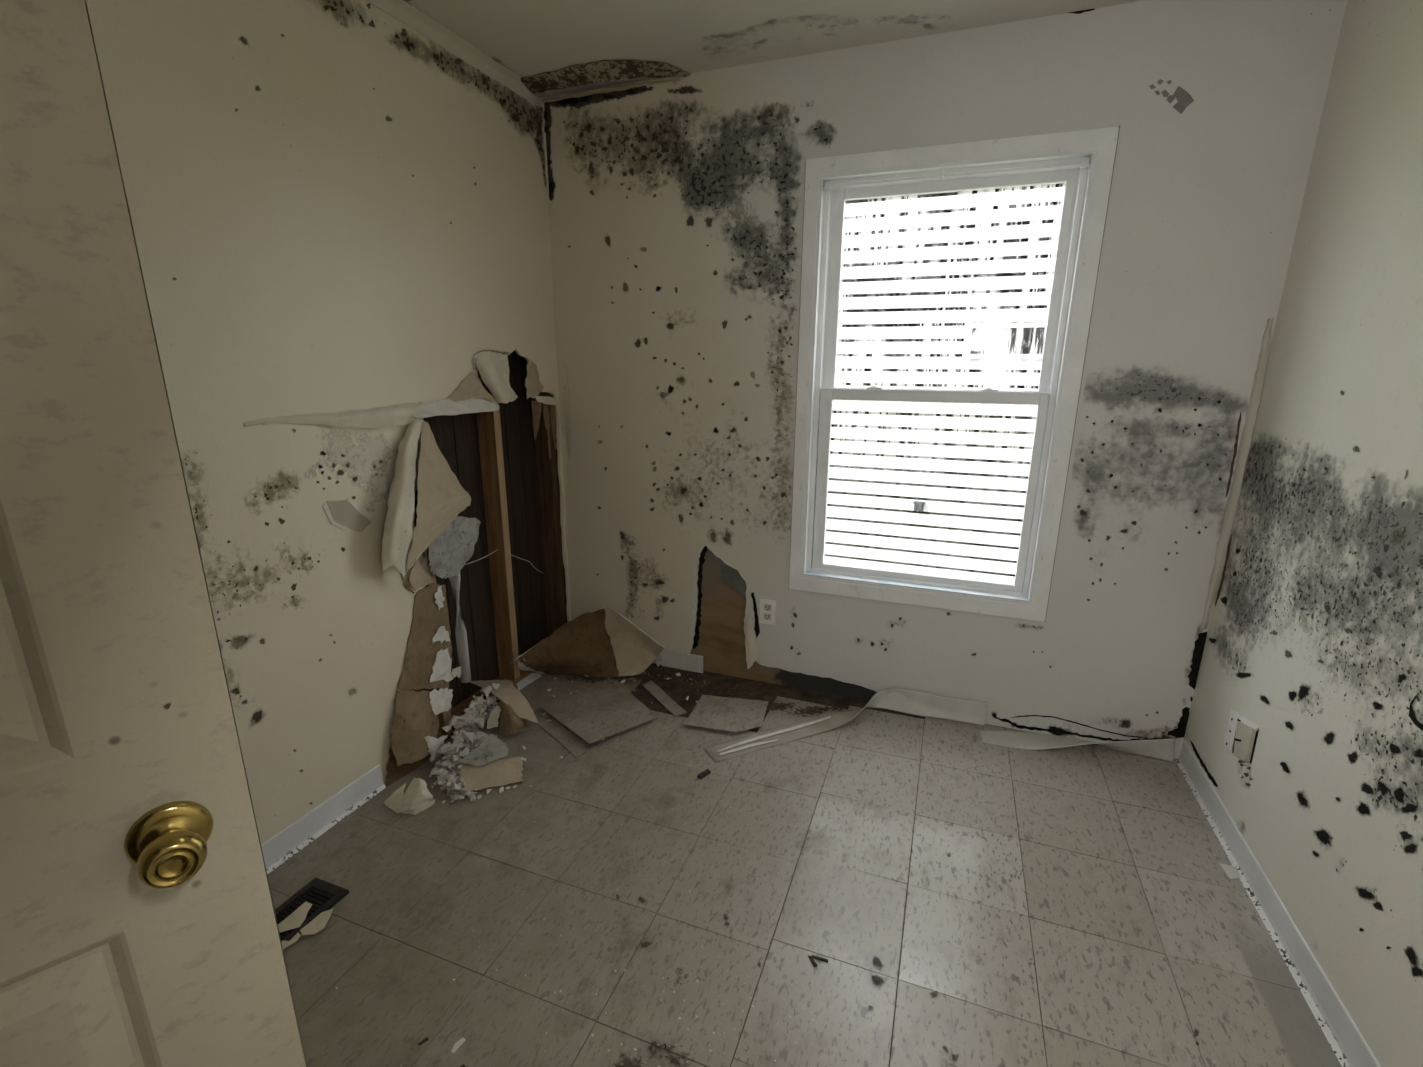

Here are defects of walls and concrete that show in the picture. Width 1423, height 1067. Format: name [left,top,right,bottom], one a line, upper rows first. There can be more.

water stain [324,0,833,543]
mould [232,687,262,722]
mould [185,453,320,620]
hole [443,413,499,709]
hole [502,351,547,654]
water stain [620,531,675,620]
spalling [690,545,760,650]
crack [992,713,1176,741]
mould [1077,370,1244,601]
water stain [1216,438,1423,857]
mould [1356,888,1392,911]
mould [1386,946,1423,977]